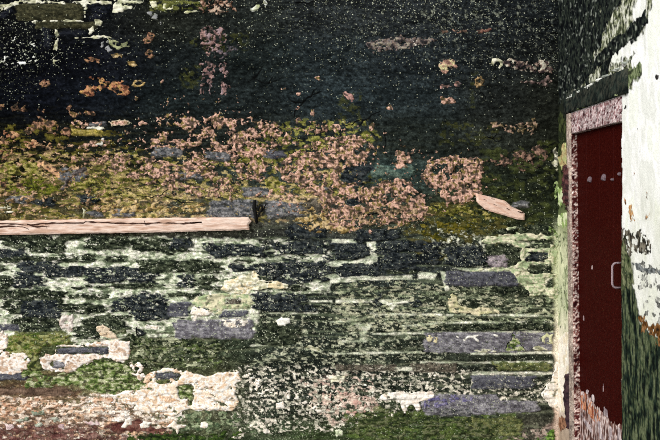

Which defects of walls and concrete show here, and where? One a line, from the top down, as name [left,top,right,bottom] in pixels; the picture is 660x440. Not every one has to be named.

peeling [0,0,173,64]
peeling [199,26,243,103]
peeling [0,103,567,234]
peeling [59,314,74,332]
rust [638,315,660,347]
peeling [0,324,322,434]
peeling [580,389,622,440]